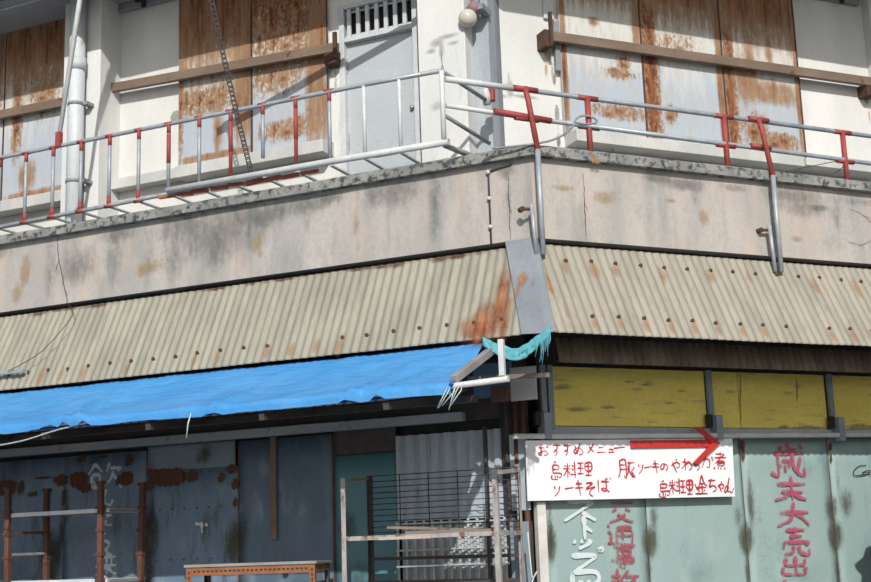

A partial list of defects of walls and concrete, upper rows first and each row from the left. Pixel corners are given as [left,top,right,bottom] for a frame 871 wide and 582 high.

rust [0,18,65,160]
rust [178,0,336,165]
rust [558,0,805,158]
rust [8,162,61,199]
rust [465,275,525,340]
water stain [741,484,753,552]